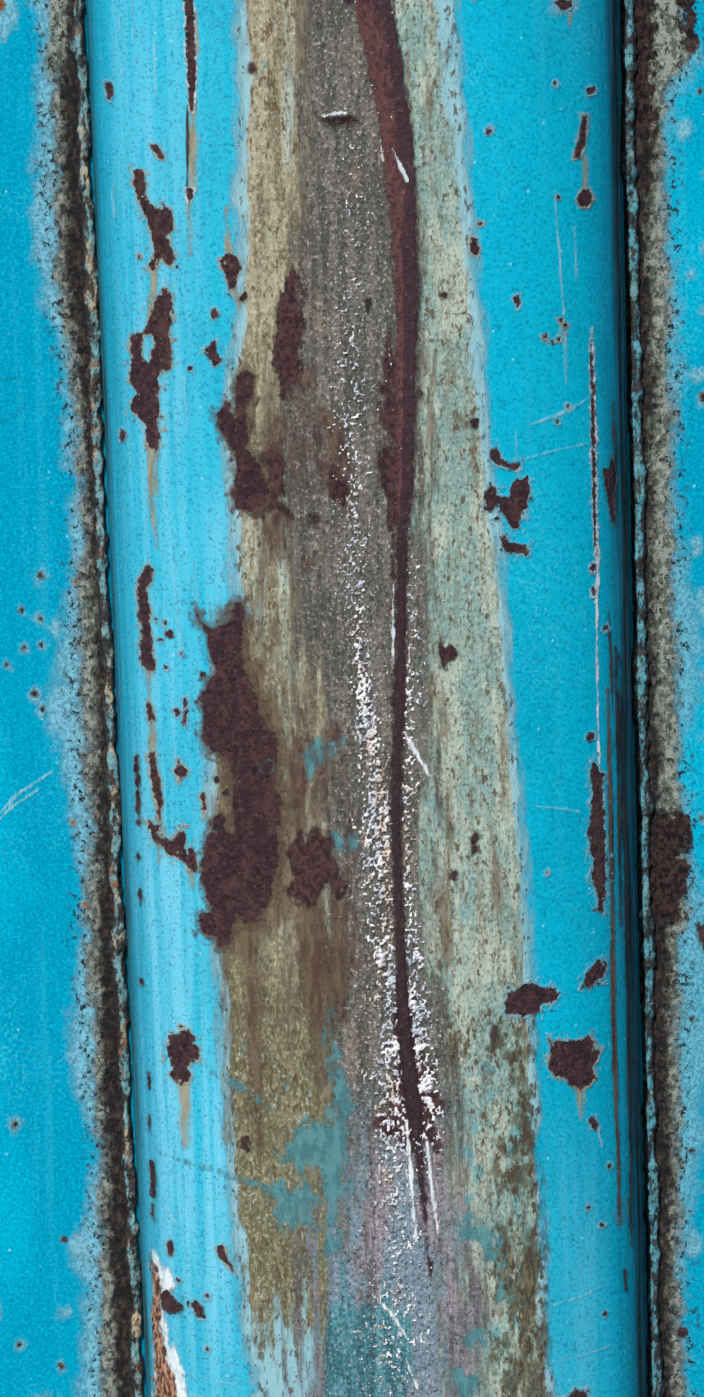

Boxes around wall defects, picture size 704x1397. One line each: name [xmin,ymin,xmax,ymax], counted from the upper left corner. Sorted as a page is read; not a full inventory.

rust [33,0,201,1397]
peeling [184,186,196,204]
peeling [172,748,226,834]
rust [145,596,360,1153]
rust [211,266,351,558]
peeling [201,0,556,1397]
rust [343,0,449,1278]
rust [483,445,534,561]
rust [490,979,562,1052]
rust [546,0,704,1397]